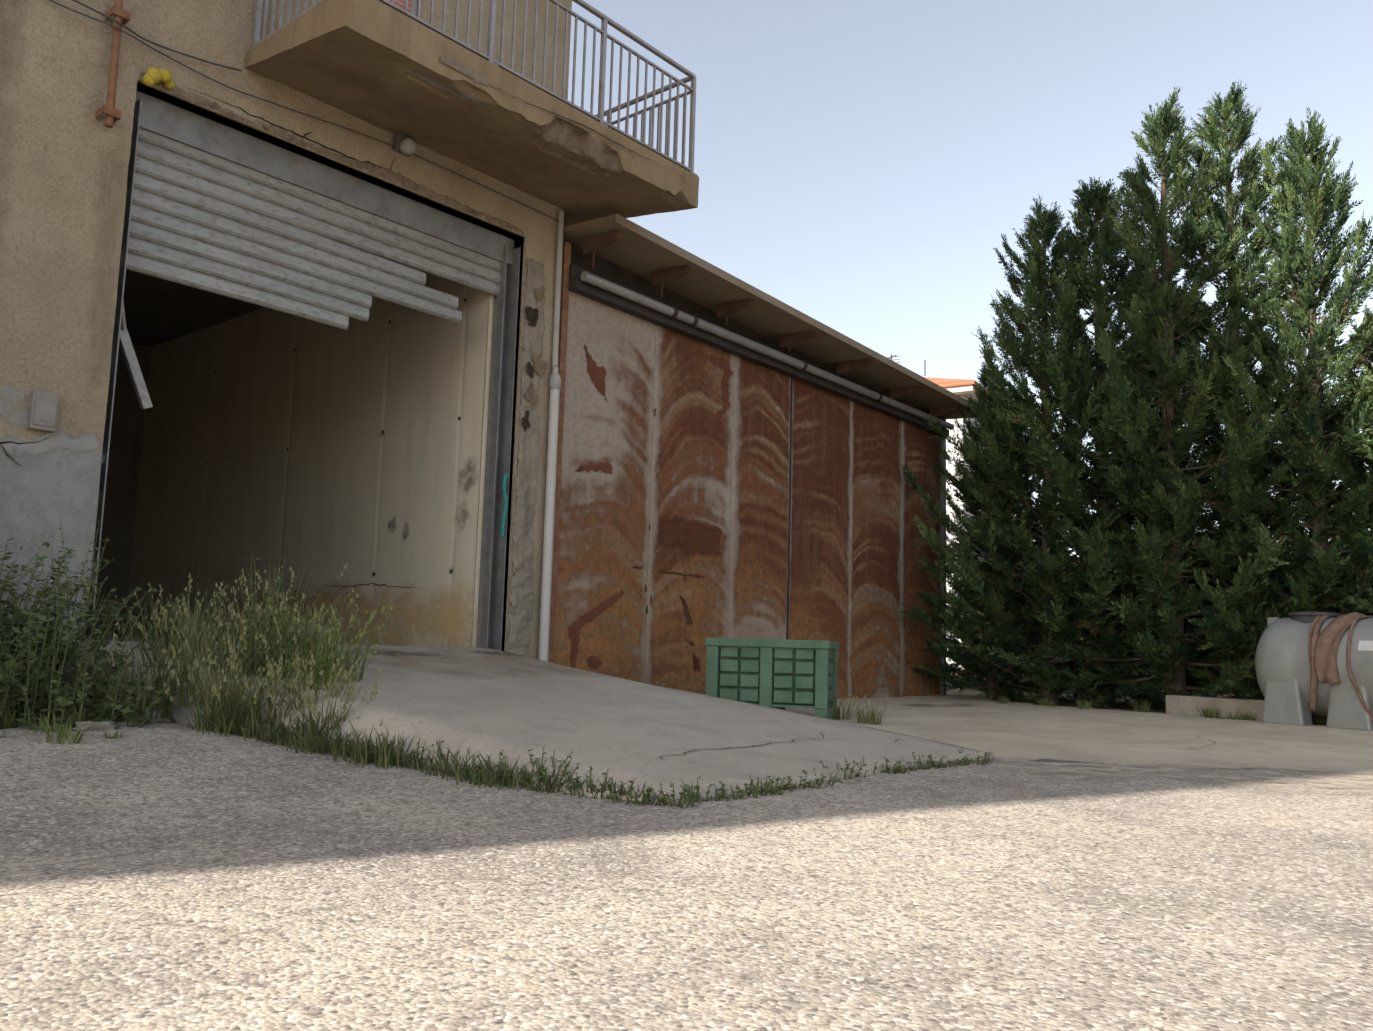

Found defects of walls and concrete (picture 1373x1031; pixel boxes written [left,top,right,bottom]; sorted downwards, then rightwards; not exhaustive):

spalling [519,118,623,174]
peeling [0,430,100,585]
spalling [507,257,547,655]
corrosion [553,327,940,699]
damp [230,592,468,664]